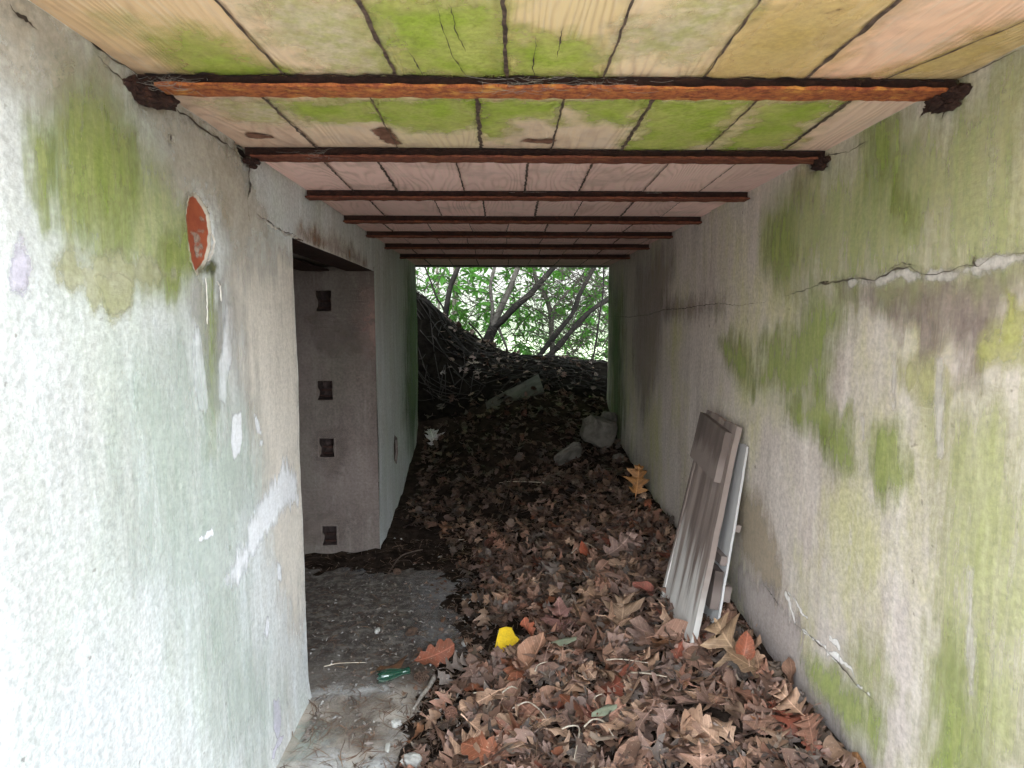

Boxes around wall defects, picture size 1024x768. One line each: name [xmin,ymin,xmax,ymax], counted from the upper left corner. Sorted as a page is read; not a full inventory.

leakage [56,248,176,318]
crack [608,253,1024,318]
leakage [870,267,1014,457]
leakage [738,493,846,749]
crack [795,624,872,699]